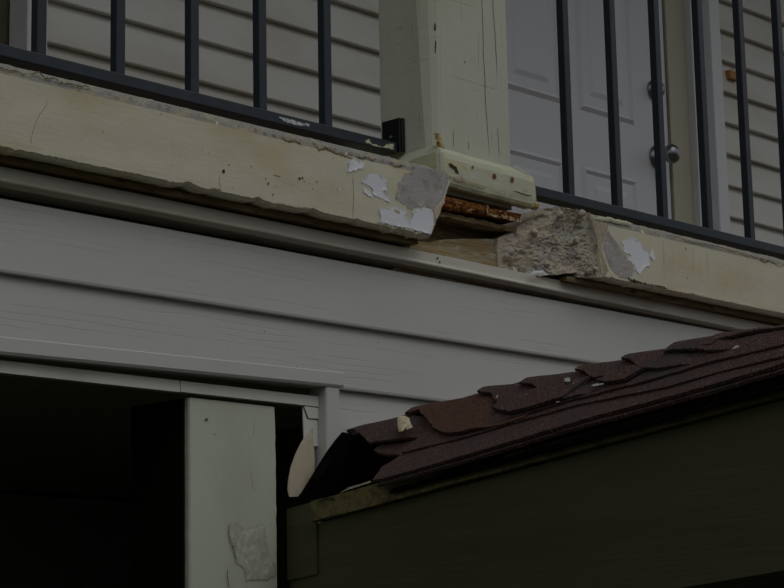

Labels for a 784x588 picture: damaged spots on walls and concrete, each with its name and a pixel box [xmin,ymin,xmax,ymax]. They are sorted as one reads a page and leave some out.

peeling [395,163,459,220]
spalling [488,207,634,280]